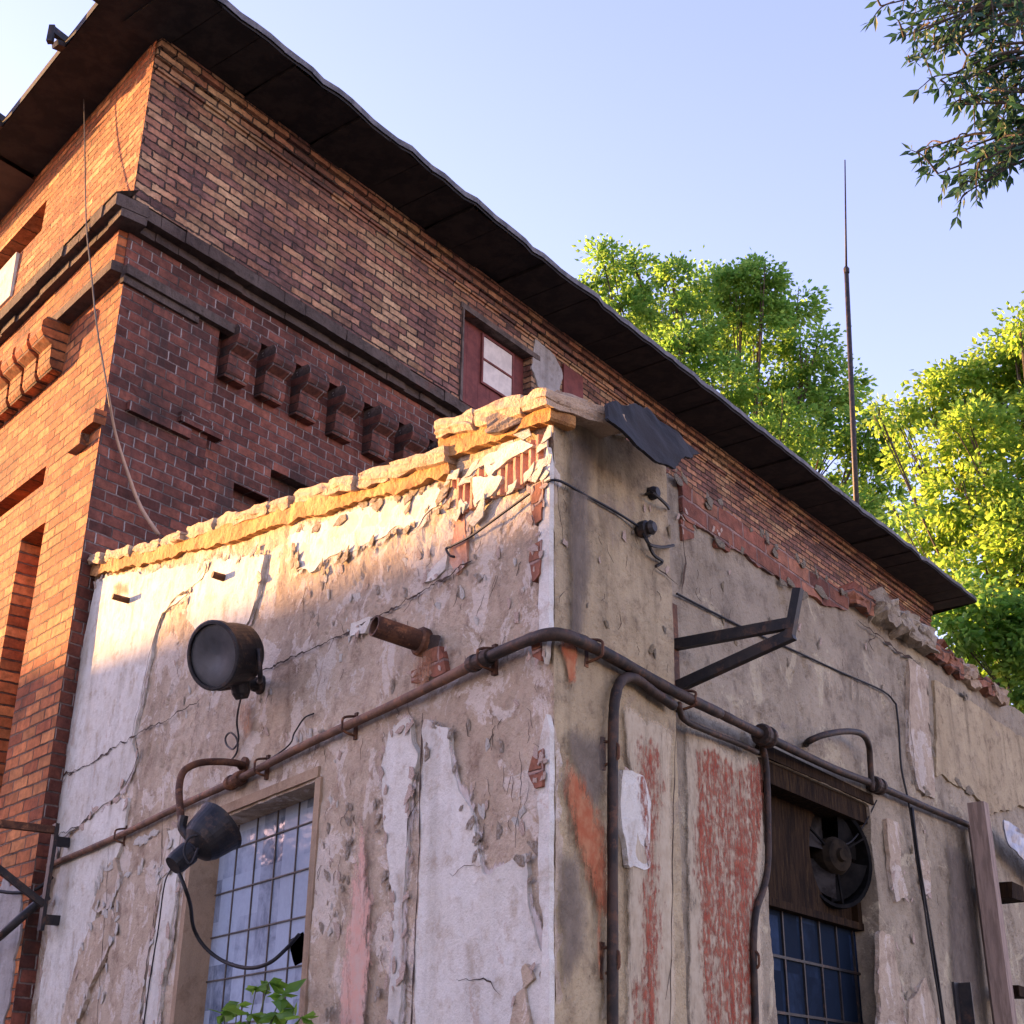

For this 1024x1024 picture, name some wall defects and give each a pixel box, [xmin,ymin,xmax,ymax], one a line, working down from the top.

flaking render [290,425,553,646]
flaking render [666,467,849,611]
crack [61,569,209,785]
flaking render [36,544,268,1024]
flaking render [314,699,548,1024]
rust [568,768,607,938]
peeling [618,708,675,1024]
flaking render [883,818,950,903]
flaking render [905,659,1024,815]